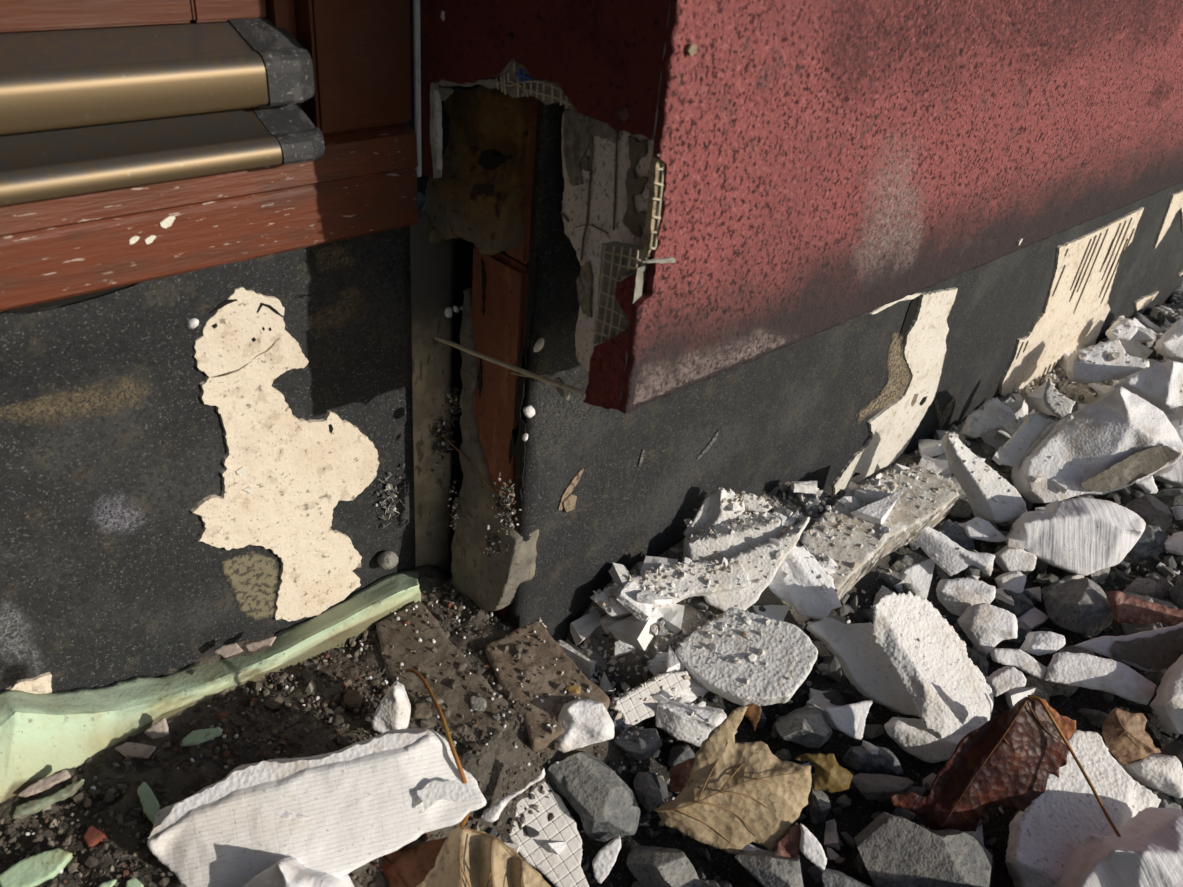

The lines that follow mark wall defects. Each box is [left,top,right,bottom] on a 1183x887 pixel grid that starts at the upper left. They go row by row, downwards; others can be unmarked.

peeling [191,287,379,622]
spalling [561,108,649,317]
peeling [832,287,958,495]
peeling [999,207,1144,397]
peeling [1134,270,1183,310]
peeling [1153,190,1183,249]
flaking render [213,637,276,658]